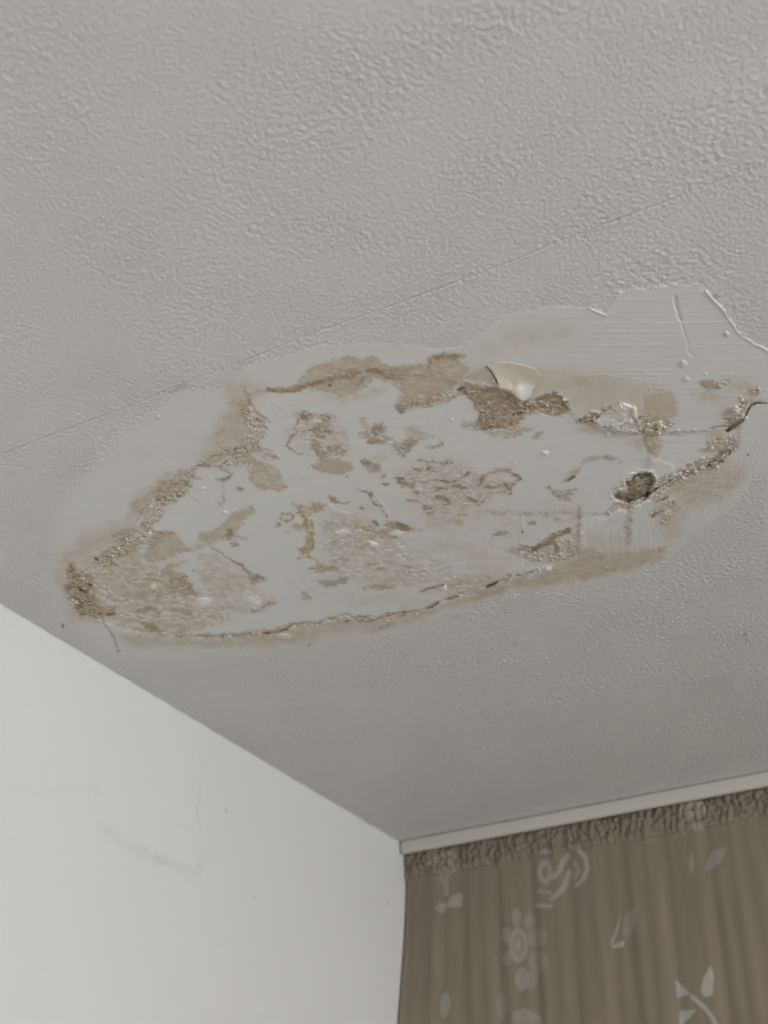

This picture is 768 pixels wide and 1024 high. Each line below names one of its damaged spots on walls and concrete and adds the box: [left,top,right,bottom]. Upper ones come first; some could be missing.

damp [46,314,767,653]
flaking render [63,362,760,639]